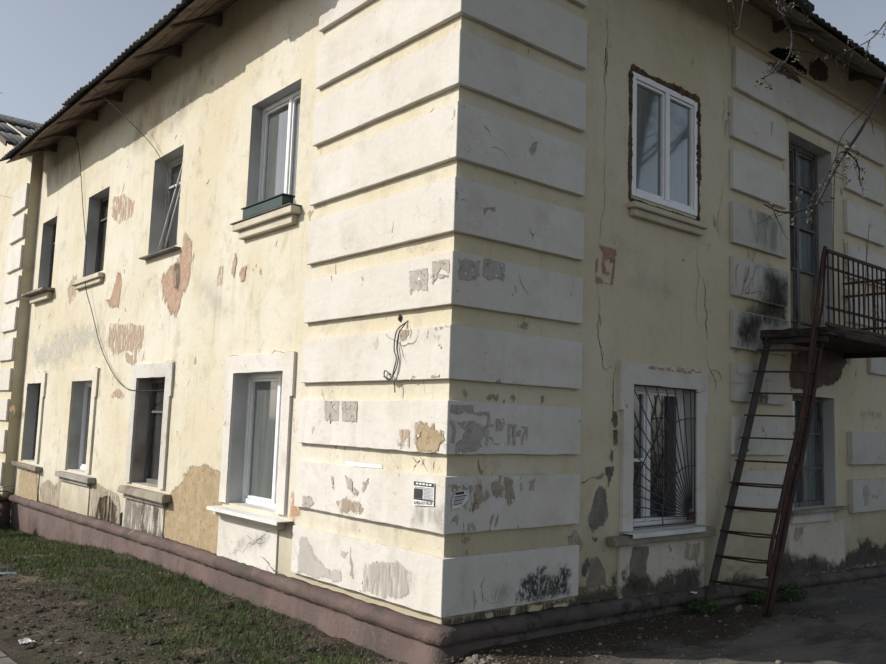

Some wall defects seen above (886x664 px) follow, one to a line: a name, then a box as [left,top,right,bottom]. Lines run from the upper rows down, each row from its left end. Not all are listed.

flaking render [628,63,702,221]
flaking render [160,234,194,318]
peeling [409,258,506,295]
water stain [739,272,788,342]
peeling [108,323,144,366]
flaking render [789,345,851,391]
peeling [397,388,528,454]
peeling [163,464,222,554]
peeling [449,477,535,544]
flaking render [568,410,618,589]
water stain [779,539,886,578]
water stain [443,566,700,625]